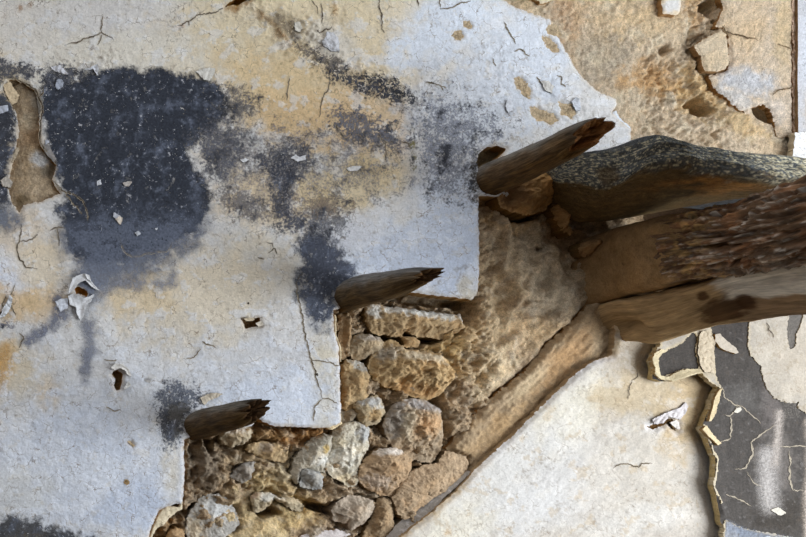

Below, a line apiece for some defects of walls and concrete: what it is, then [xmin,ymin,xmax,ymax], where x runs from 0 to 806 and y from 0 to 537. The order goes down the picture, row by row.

flaking render [504,0,796,156]
flaking render [0,81,59,212]
water stain [0,14,503,330]
water stain [0,515,81,537]
water stain [23,295,68,345]
water stain [79,321,96,382]
water stain [149,380,202,451]
flaking render [149,421,384,537]
crack [296,275,339,421]
flaking render [377,200,644,537]
peeling [646,322,806,537]
peeling [787,315,802,349]